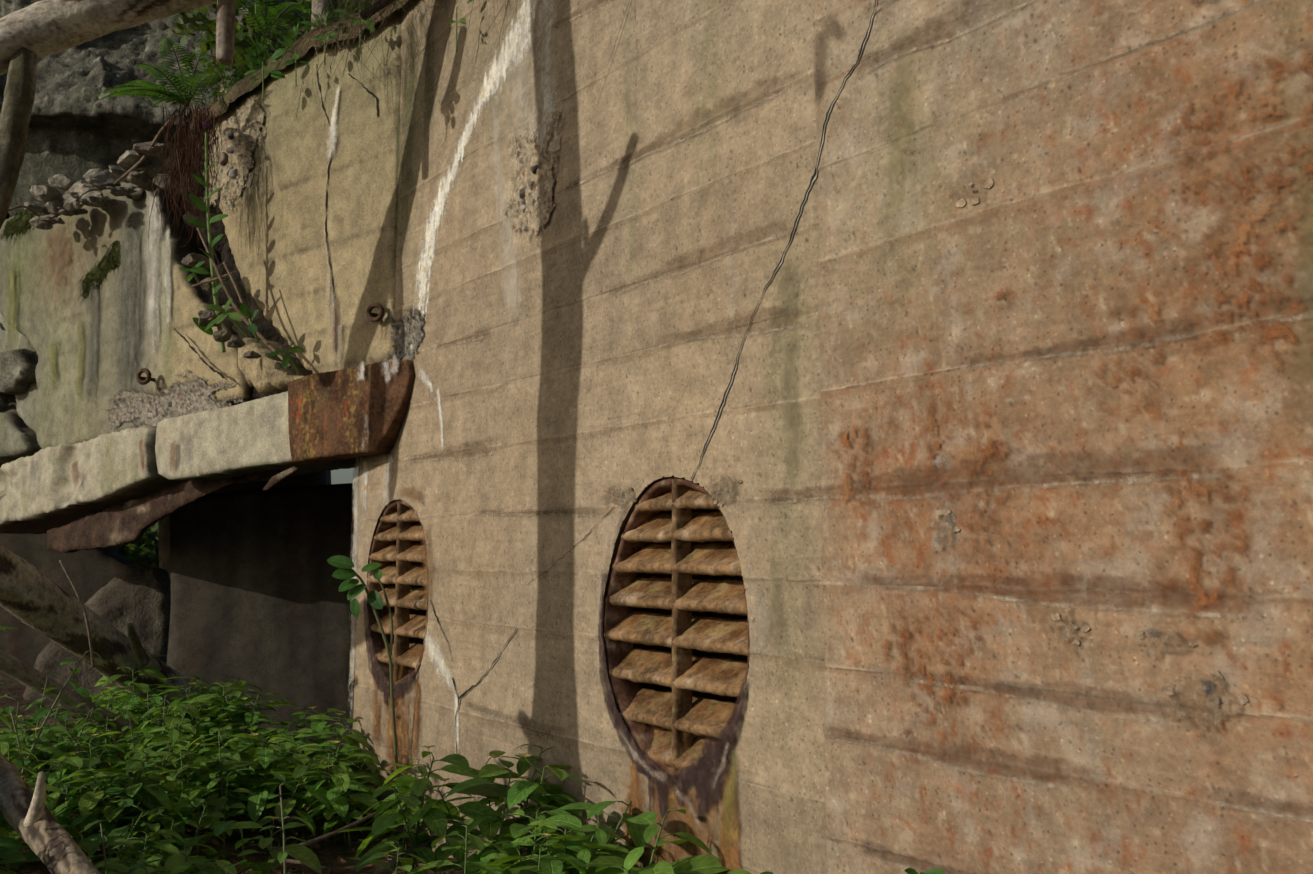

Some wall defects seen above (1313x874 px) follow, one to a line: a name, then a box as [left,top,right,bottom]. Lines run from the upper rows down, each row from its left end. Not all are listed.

spalling [202,85,268,215]
crack [316,64,379,302]
damp [396,27,430,210]
damp [414,0,580,344]
spalling [502,111,562,247]
crack [691,0,877,480]
rust [1204,52,1313,364]
spalling [388,304,426,361]
crack [528,507,614,584]
rust [1161,470,1246,643]
rust [373,678,420,777]
rust [625,760,740,874]